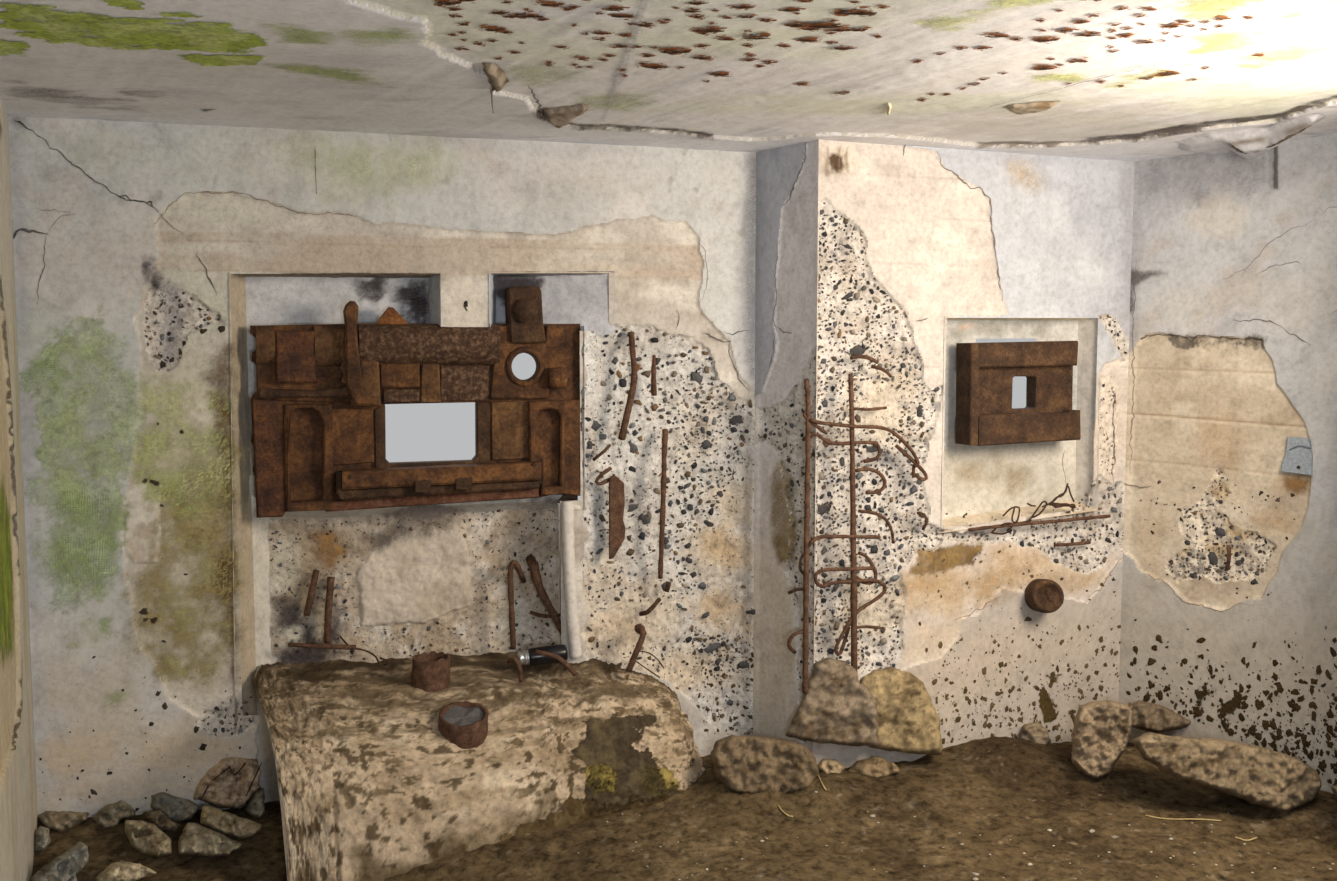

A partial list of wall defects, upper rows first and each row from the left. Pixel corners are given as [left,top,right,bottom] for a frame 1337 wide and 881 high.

corrosion [433,0,890,83]
peeling [345,0,1337,147]
corrosion [917,71,1007,102]
corrosion [911,0,1255,71]
corrosion [1139,66,1210,81]
crack [15,120,440,296]
peeling [120,139,1311,803]